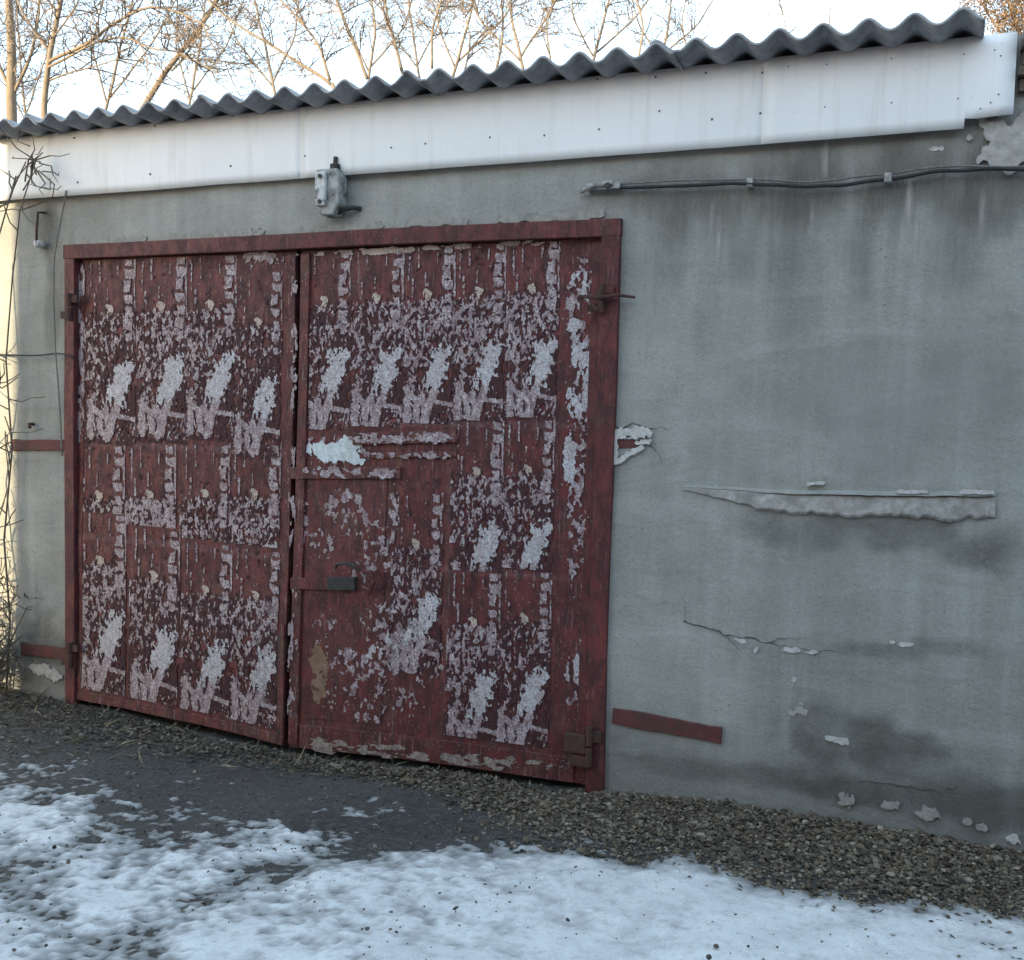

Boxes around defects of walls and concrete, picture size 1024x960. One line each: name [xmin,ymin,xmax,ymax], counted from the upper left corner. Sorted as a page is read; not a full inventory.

flaking render [614,425,654,465]
peeling [78,240,592,771]
crack [681,596,848,654]
flaking render [28,663,64,683]